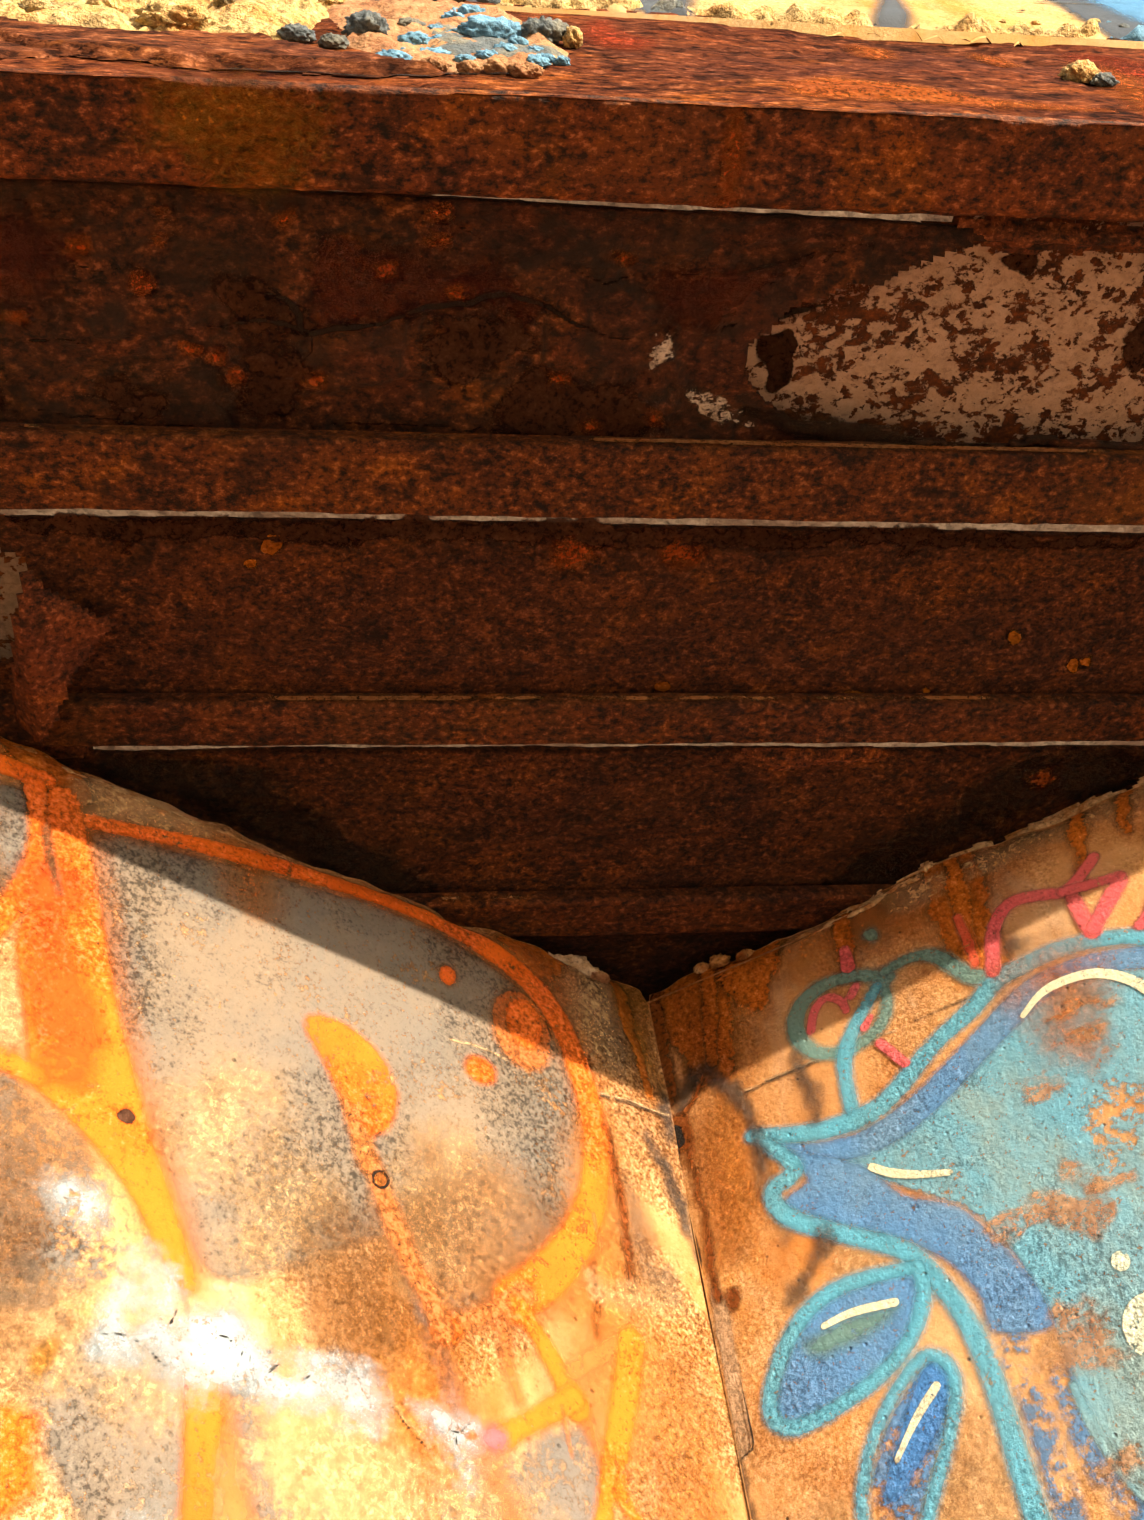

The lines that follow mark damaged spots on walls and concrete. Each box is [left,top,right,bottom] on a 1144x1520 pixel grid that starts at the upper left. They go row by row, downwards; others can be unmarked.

peeling [0,16,509,78]
corrosion [784,77,1110,111]
corrosion [1068,54,1144,111]
corrosion [957,216,1144,256]
spalling [742,241,1144,448]
spalling [0,550,28,661]
corrosion [0,570,117,819]
spalling [13,745,310,868]
spalling [548,951,599,978]
spalling [780,776,1144,944]
corrosion [920,852,1013,989]
corrosion [609,939,782,1311]